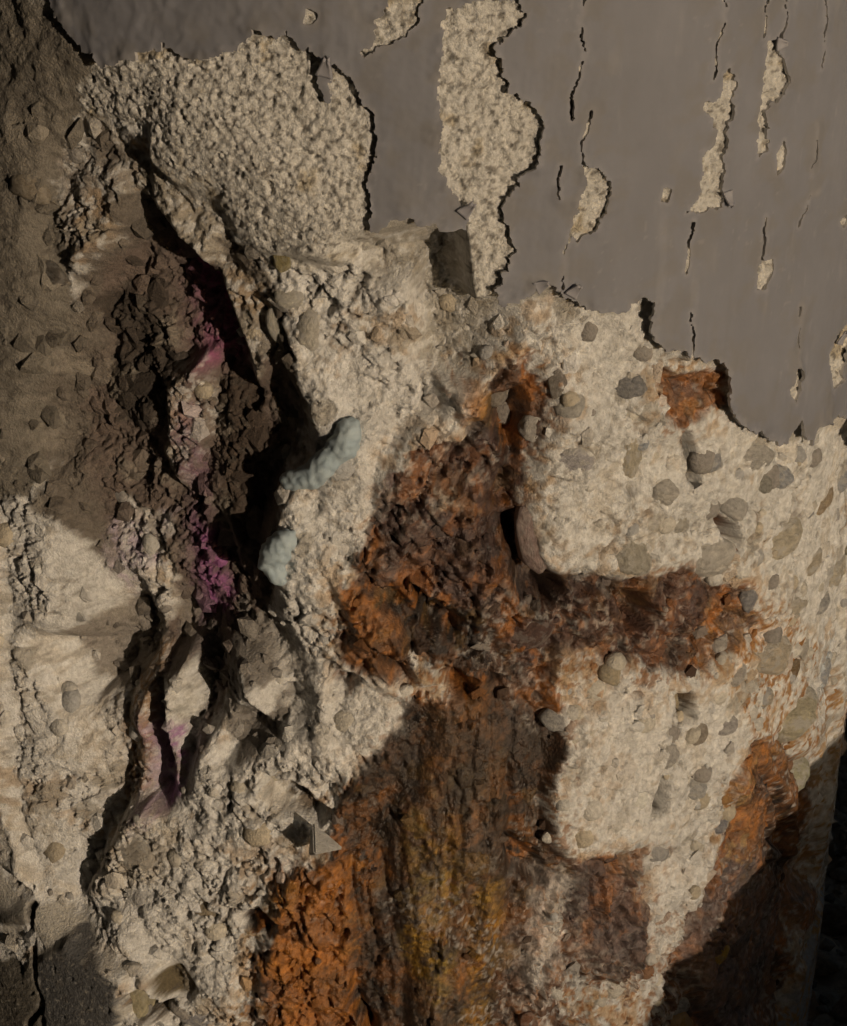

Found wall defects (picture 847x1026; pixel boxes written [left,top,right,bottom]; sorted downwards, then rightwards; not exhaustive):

flaking render [76,30,375,273]
peeling [437,0,544,298]
crack [556,28,592,199]
peeling [686,70,736,213]
peeling [756,37,789,172]
crack [685,222,693,273]
rust [456,370,490,426]
crack [682,313,694,361]
rust [658,367,728,429]
rust [338,585,411,684]
rust [725,729,799,872]
crack [25,900,46,1026]